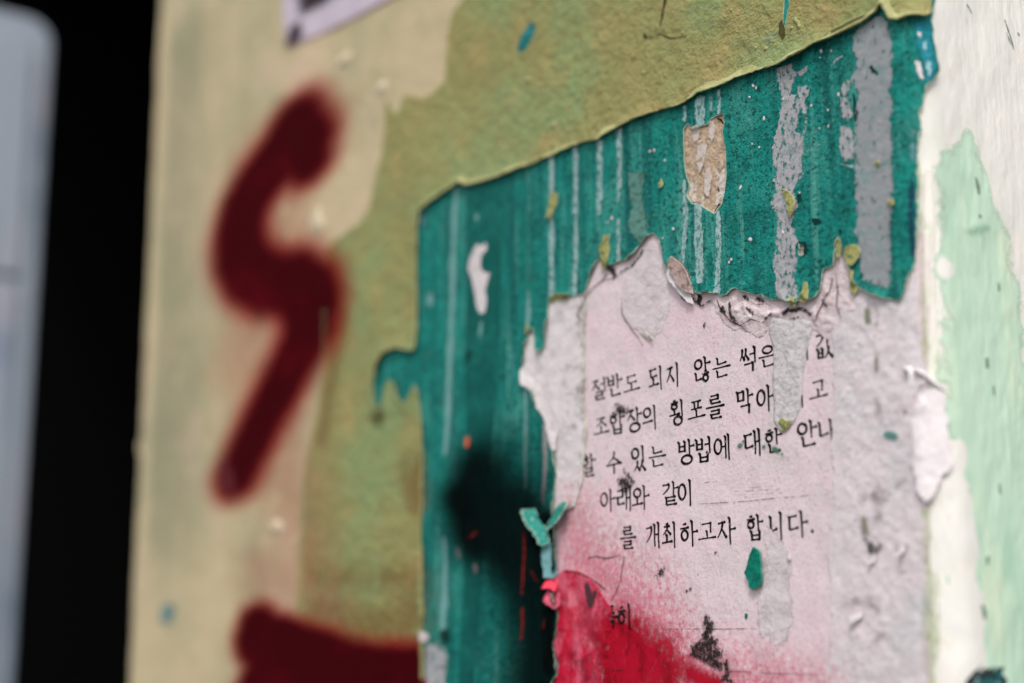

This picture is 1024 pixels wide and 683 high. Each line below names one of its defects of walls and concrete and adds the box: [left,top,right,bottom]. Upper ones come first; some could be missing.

peeling [373,0,940,683]